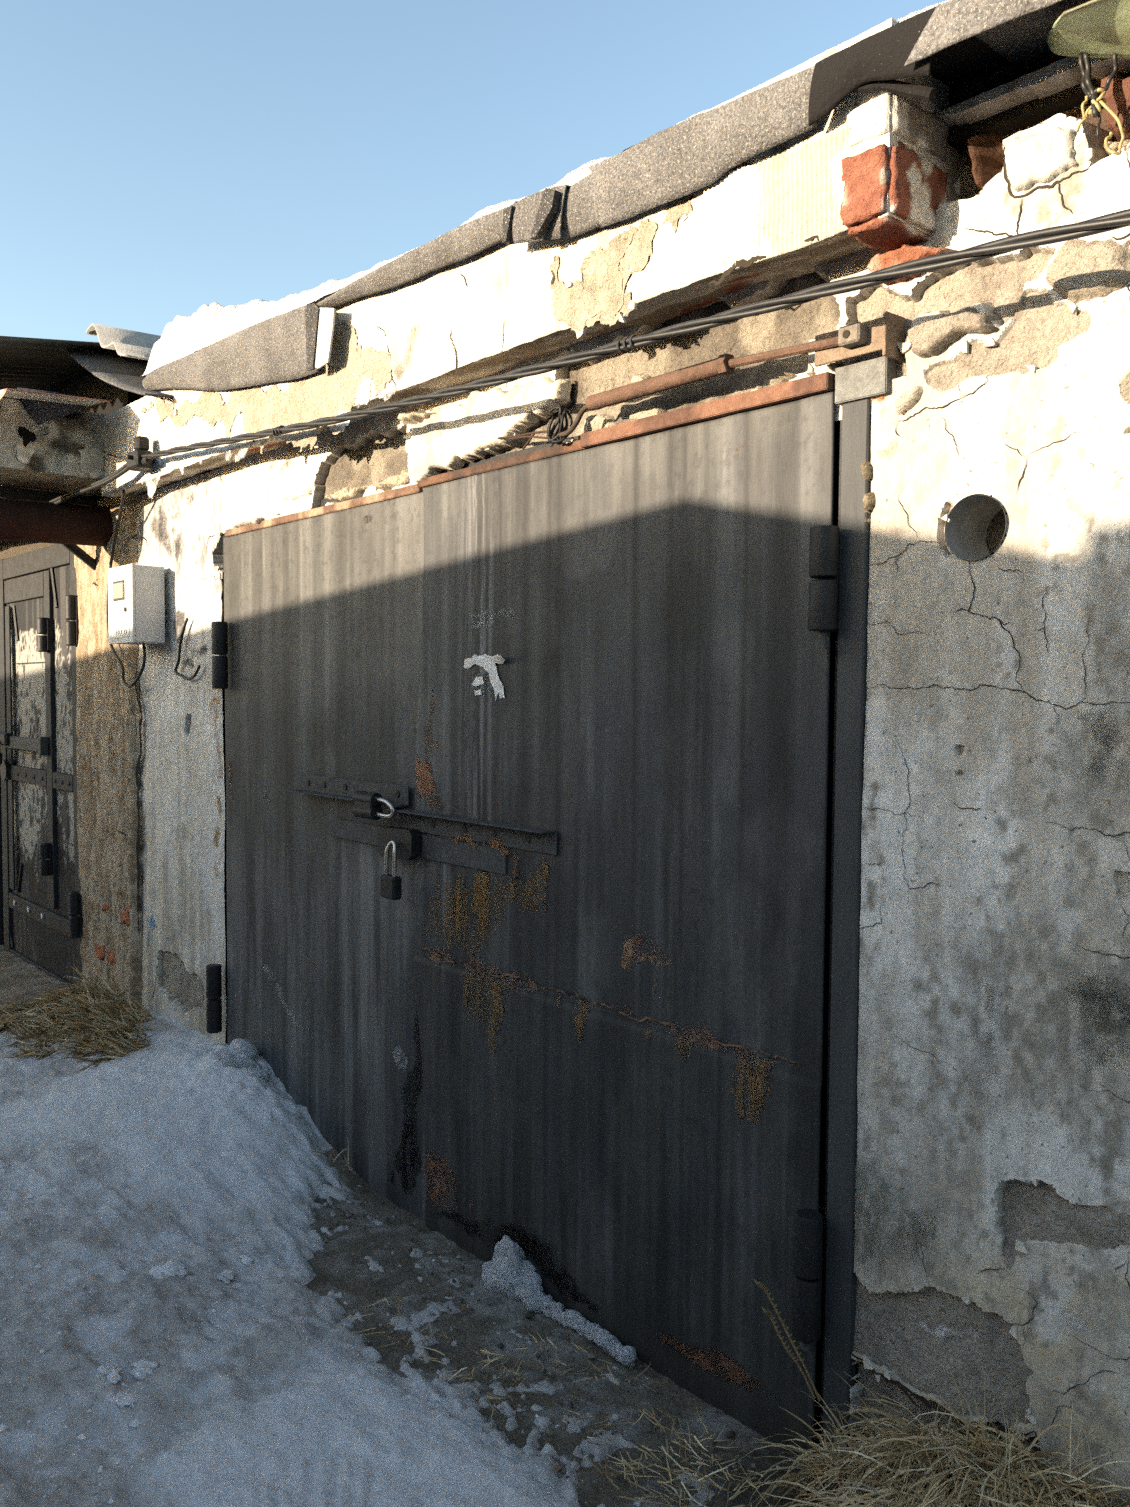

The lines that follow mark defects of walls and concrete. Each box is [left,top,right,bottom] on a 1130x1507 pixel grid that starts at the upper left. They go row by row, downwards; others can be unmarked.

flaking render [488,74,1130,458]
peeling [141,320,409,499]
crack [872,481,1128,721]
corrosion [437,836,548,941]
crack [858,739,938,929]
crack [1047,822,1130,860]
flaking render [162,952,204,1012]
flaking render [990,1179,1130,1269]
flaking render [846,1276,1041,1453]
crack [850,1268,1130,1455]